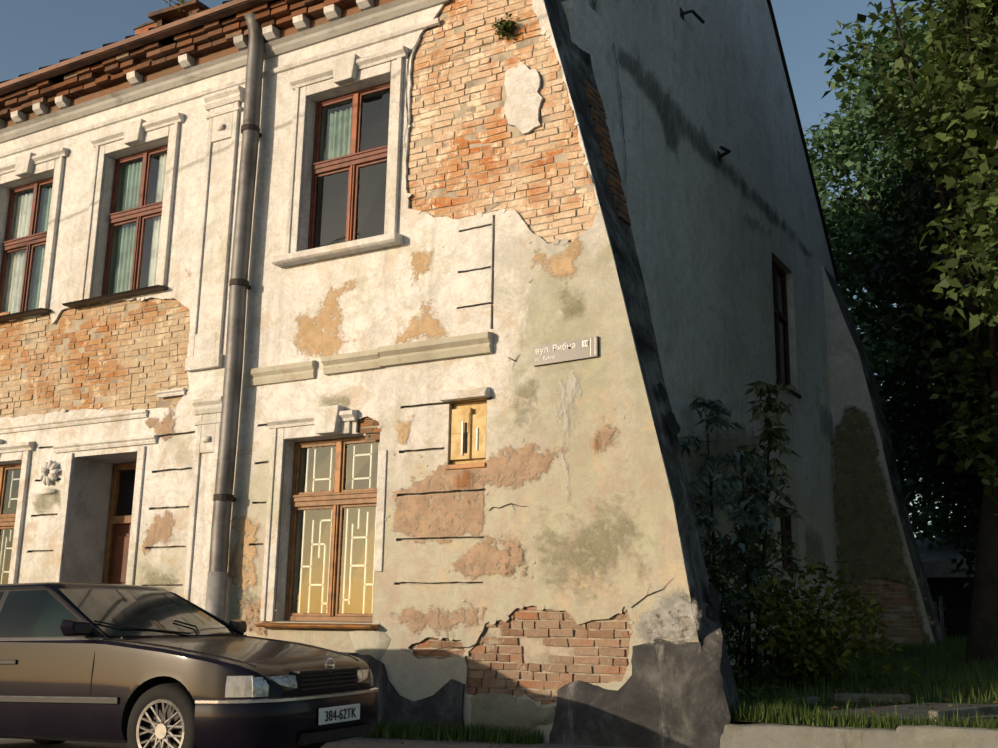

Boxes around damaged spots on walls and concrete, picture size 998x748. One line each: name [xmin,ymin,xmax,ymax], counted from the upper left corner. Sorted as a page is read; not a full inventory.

spalling [404,0,631,284]
damp [620,49,794,236]
spalling [0,297,190,441]
peeling [294,280,356,361]
peeling [396,245,460,343]
peeling [142,511,174,555]
peeling [231,516,266,635]
peeling [384,438,567,580]
spalling [396,591,698,707]